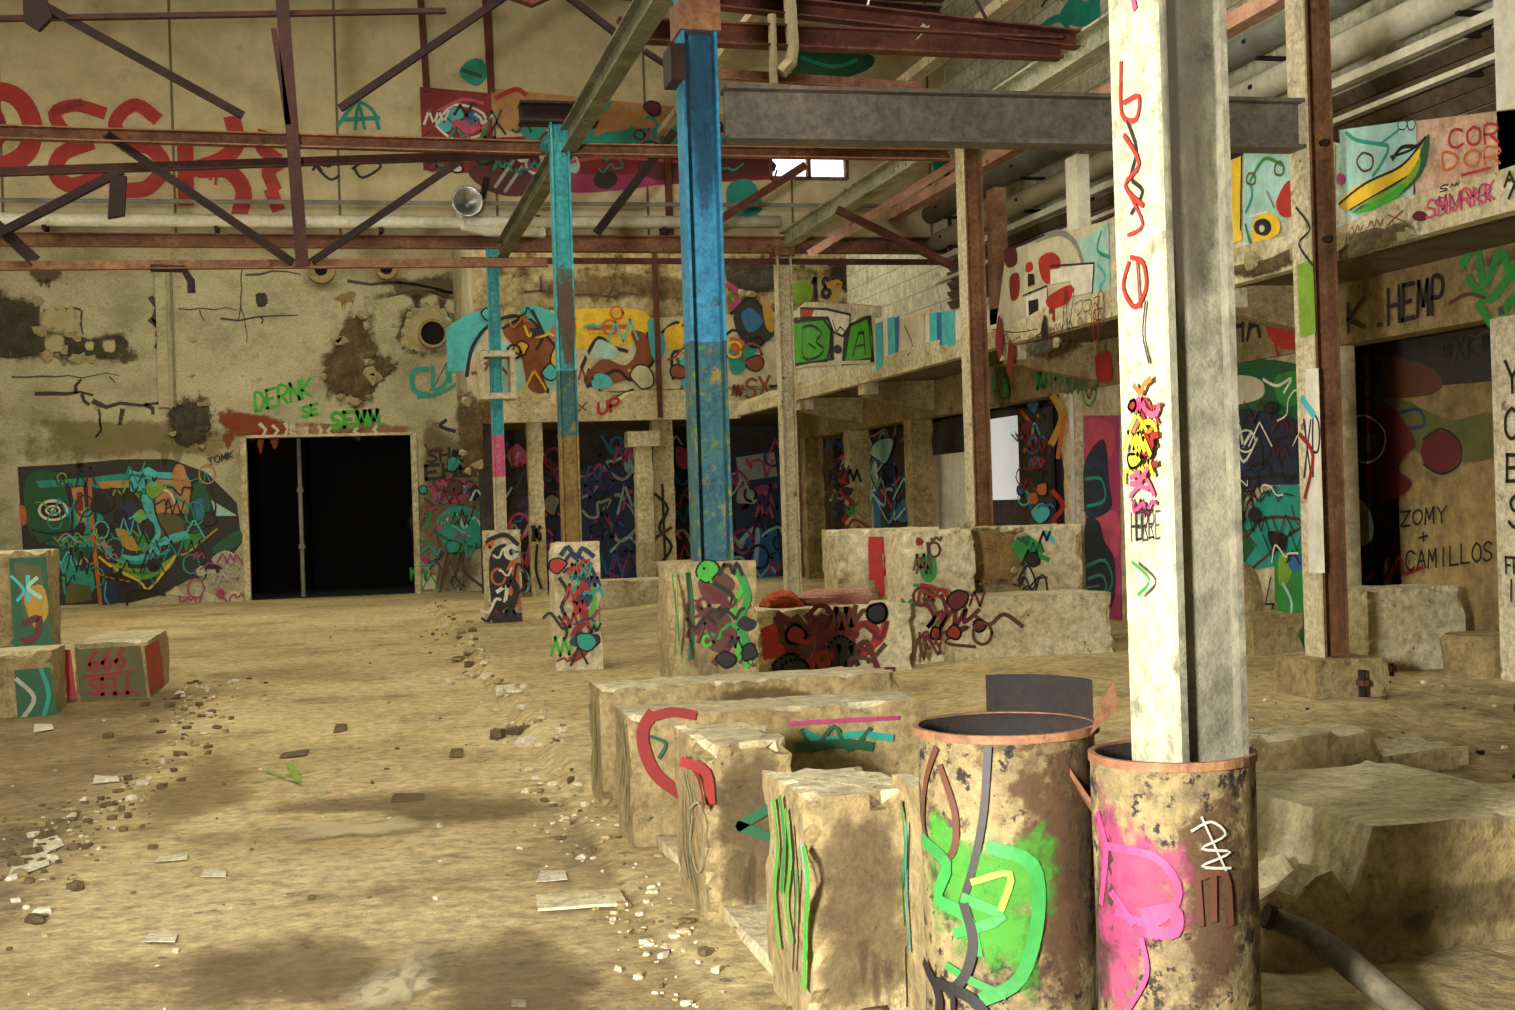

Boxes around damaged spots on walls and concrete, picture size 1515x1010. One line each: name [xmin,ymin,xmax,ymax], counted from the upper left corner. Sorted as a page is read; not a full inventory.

corrosion [685,30,713,199]
crack [43,307,84,335]
peeling [0,290,137,365]
spalling [320,303,454,409]
crack [12,372,159,438]
spalling [167,396,217,453]
corrosion [1178,788,1249,1003]